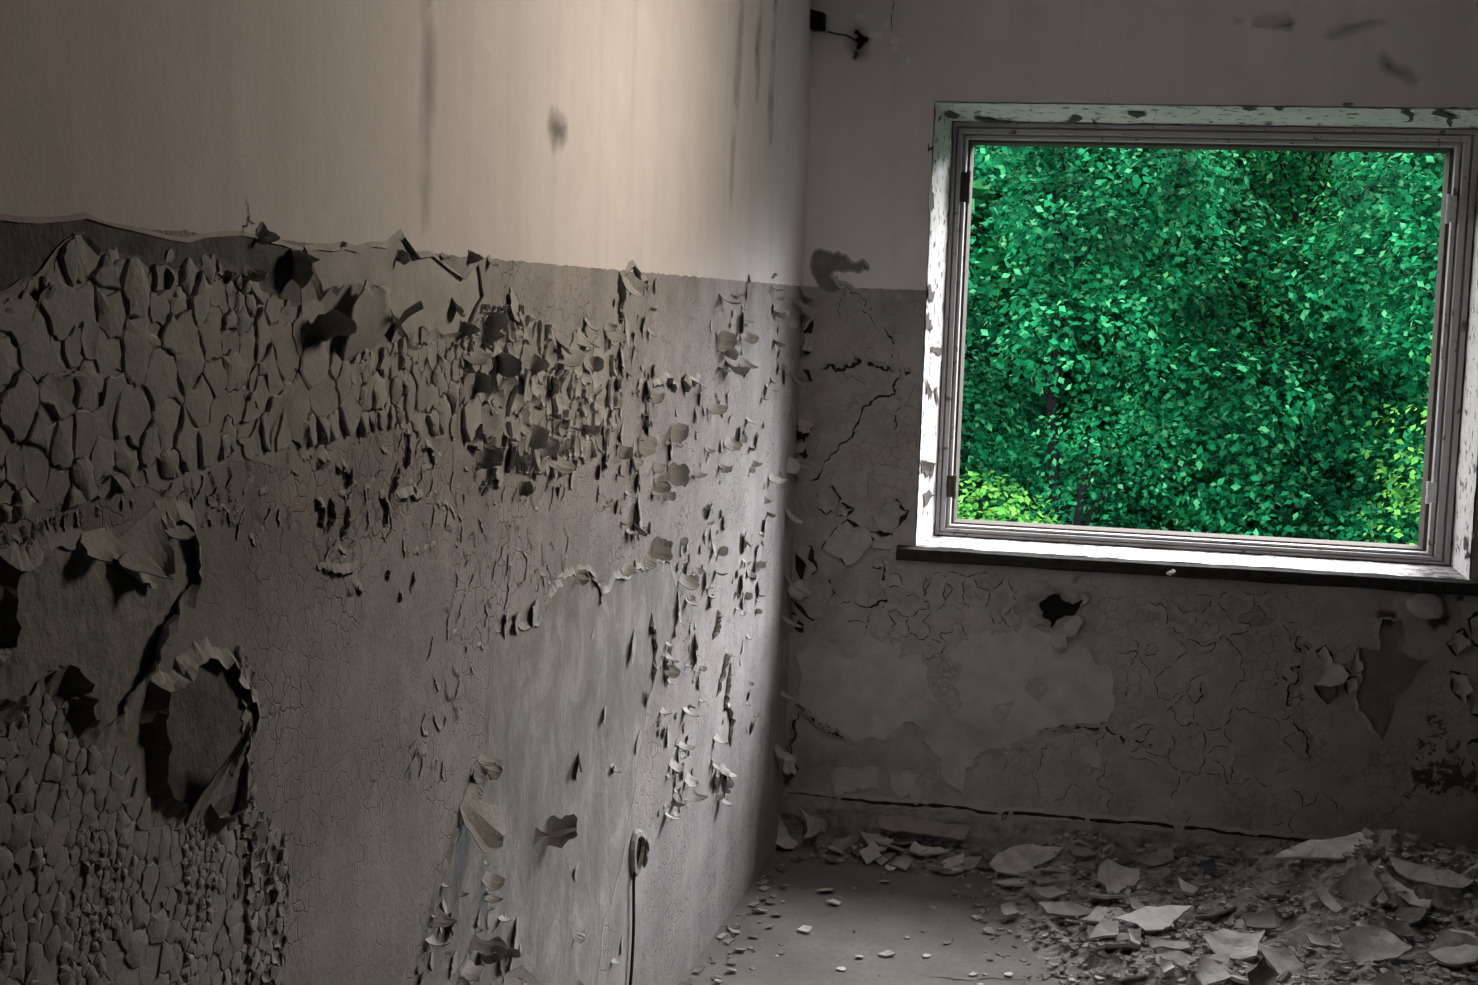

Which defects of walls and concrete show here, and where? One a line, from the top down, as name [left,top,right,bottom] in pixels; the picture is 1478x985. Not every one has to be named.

spalling [944,110,1013,123]
spalling [1401,107,1458,127]
crack [811,275,911,485]
spalling [0,212,1120,985]
peeling [1314,611,1478,741]
peeling [1381,714,1478,799]